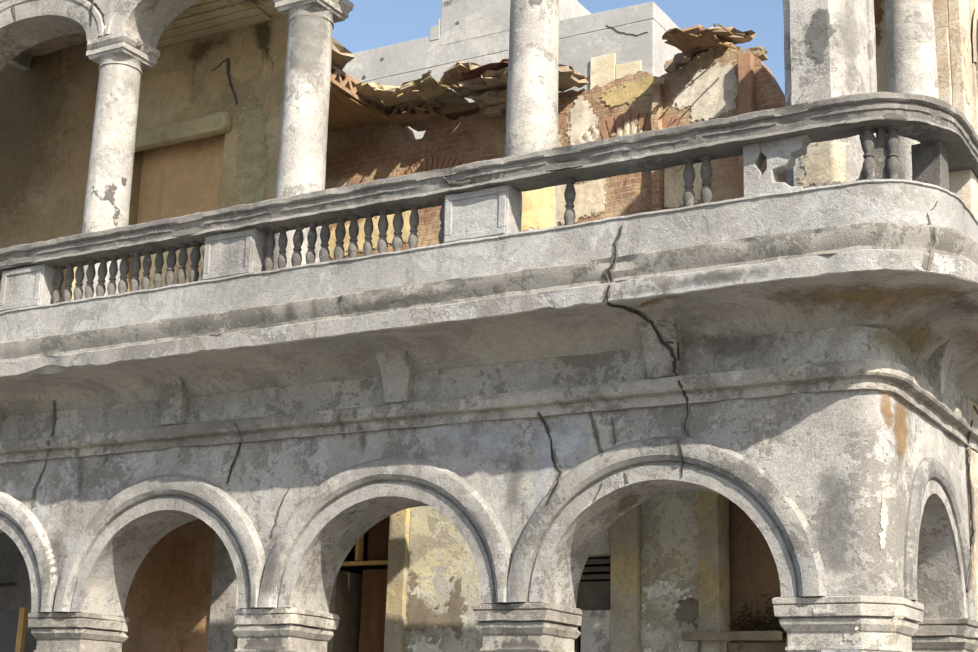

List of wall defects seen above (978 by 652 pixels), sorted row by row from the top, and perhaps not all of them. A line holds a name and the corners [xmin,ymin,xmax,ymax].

crack [89,0,105,26]
peeling [558,58,738,147]
spalling [91,176,127,226]
crack [603,225,692,477]
crack [32,400,56,508]
crack [226,422,242,484]
crack [536,412,563,506]
crack [589,410,616,456]
crack [270,487,290,539]
crack [965,420,976,592]
peeling [406,571,468,652]
peeling [641,579,699,628]